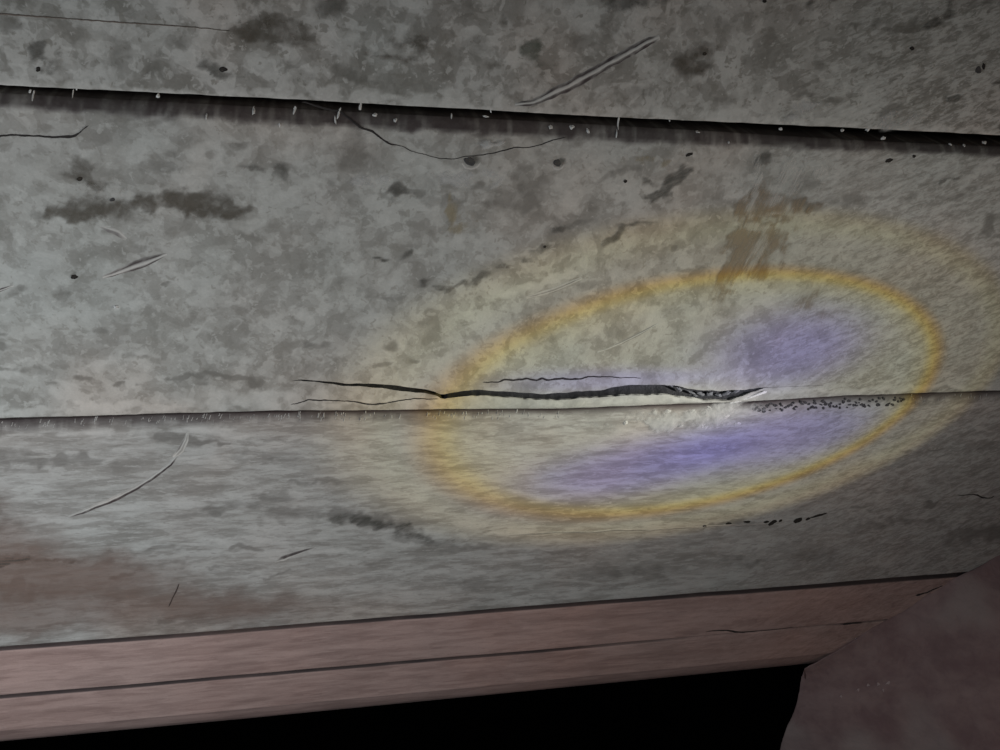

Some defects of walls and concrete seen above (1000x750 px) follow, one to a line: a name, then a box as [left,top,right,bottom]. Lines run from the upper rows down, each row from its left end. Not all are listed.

crack [0,126,88,138]
crack [303,102,565,159]
crack [291,376,767,405]